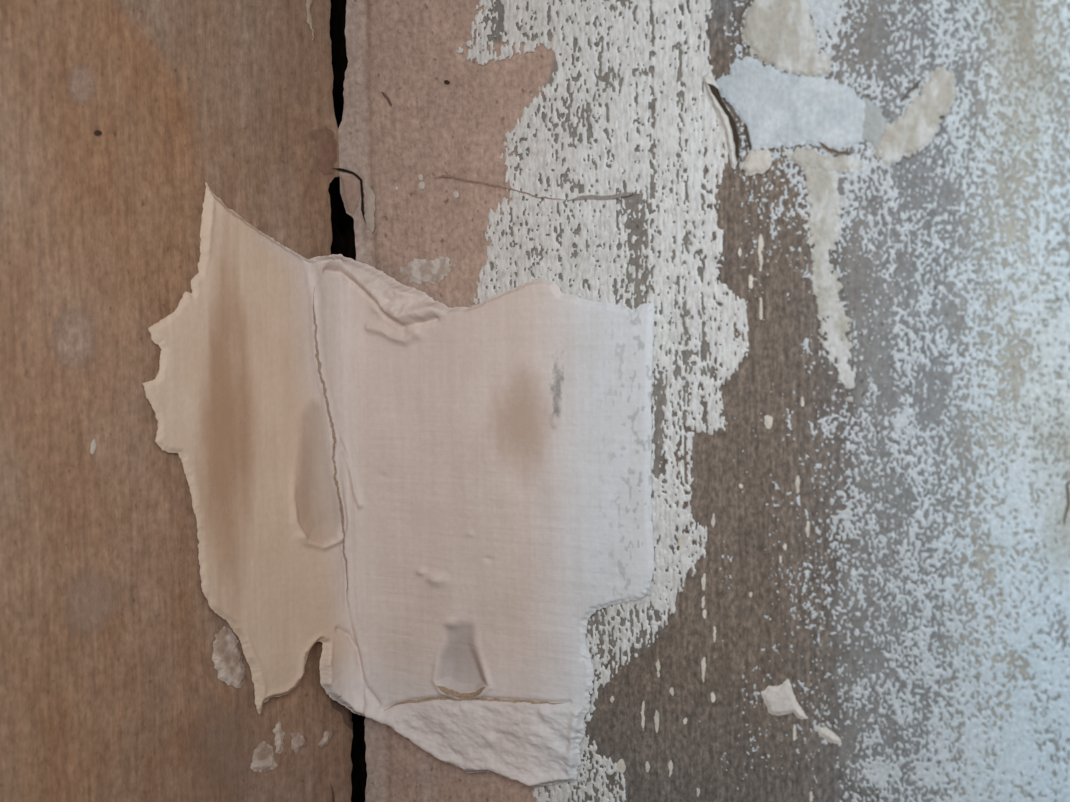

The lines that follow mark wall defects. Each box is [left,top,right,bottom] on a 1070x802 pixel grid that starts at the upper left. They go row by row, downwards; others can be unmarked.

crack [312,0,366,261]
spalling [364,181,375,233]
crack [313,287,349,605]
peeling [456,0,1070,802]
crack [328,695,367,802]
spalling [437,686,484,698]